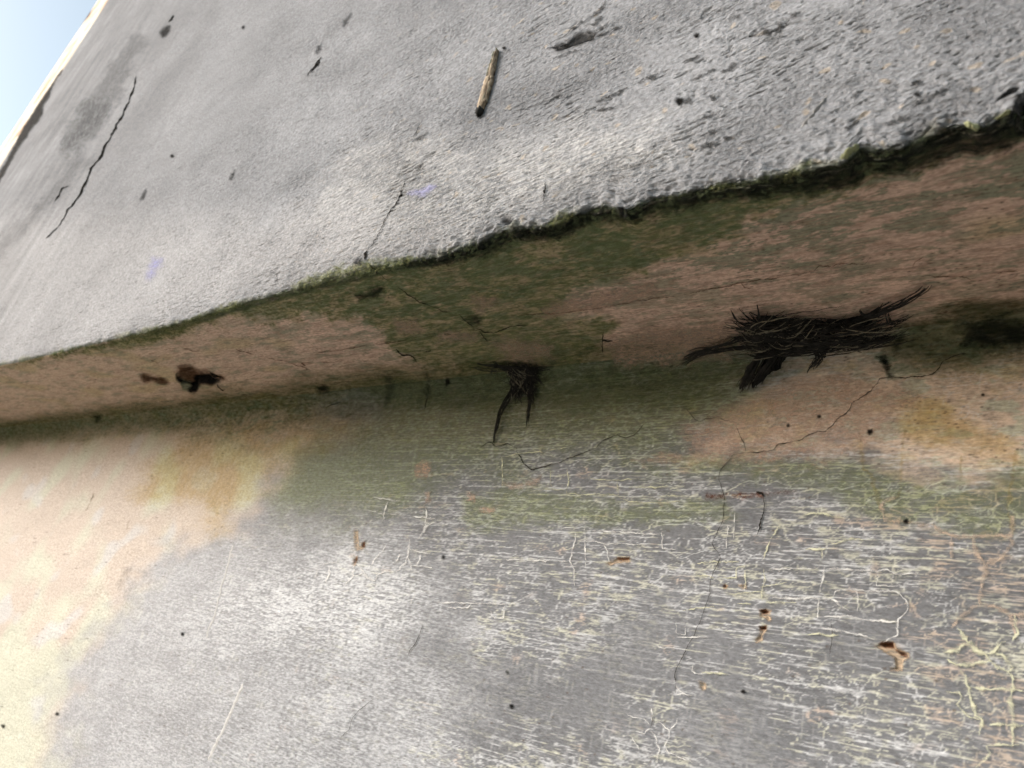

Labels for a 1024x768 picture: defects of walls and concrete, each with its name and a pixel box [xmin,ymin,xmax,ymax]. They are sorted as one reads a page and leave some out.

crack [46,76,137,238]
spalling [144,368,224,392]
crack [481,425,643,470]
crack [674,353,966,687]